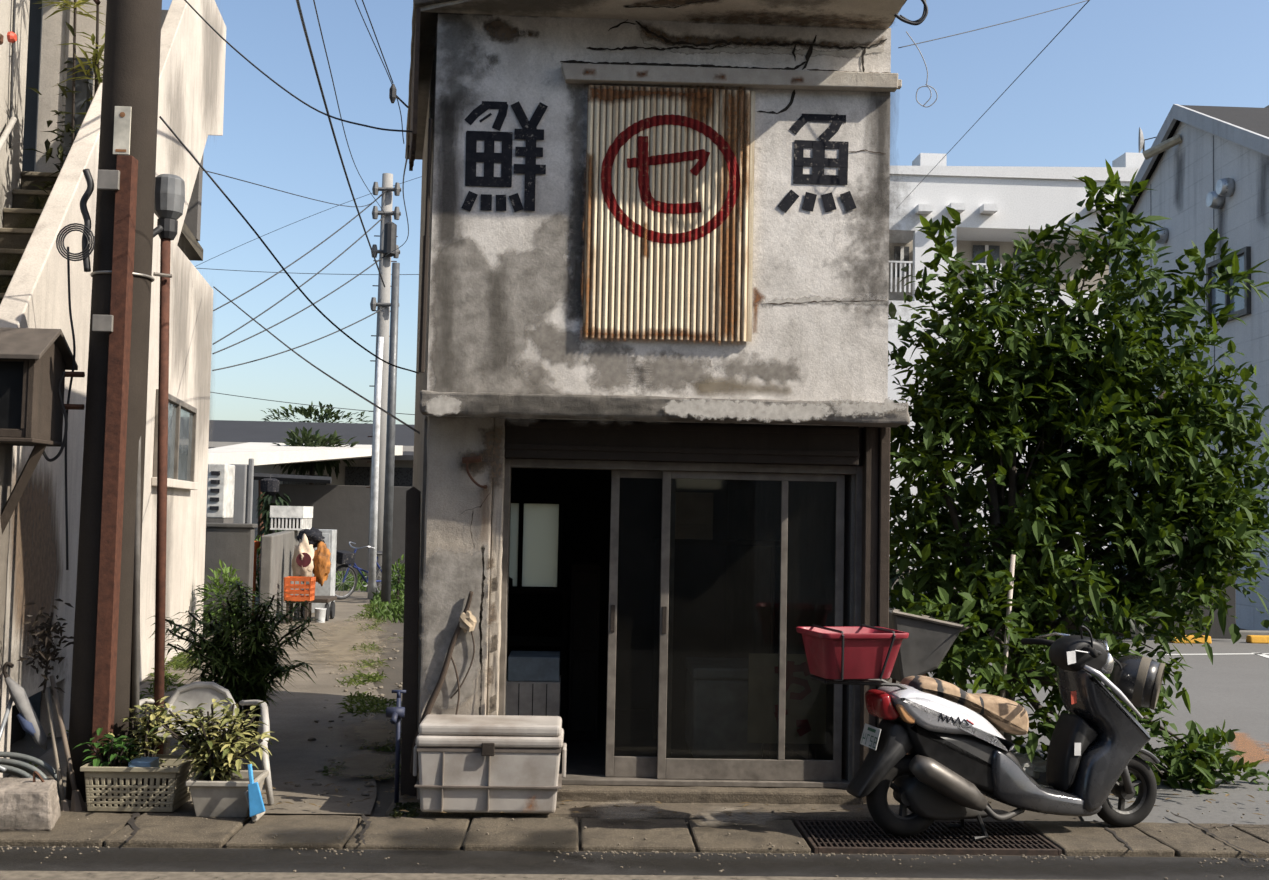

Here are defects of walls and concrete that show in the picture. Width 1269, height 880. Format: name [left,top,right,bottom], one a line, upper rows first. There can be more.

crack [560,19,889,114]
water stain [438,100,457,243]
water stain [566,85,586,318]
rust [583,70,749,341]
peeling [426,214,907,422]
rust [754,288,764,323]
crack [760,295,890,308]